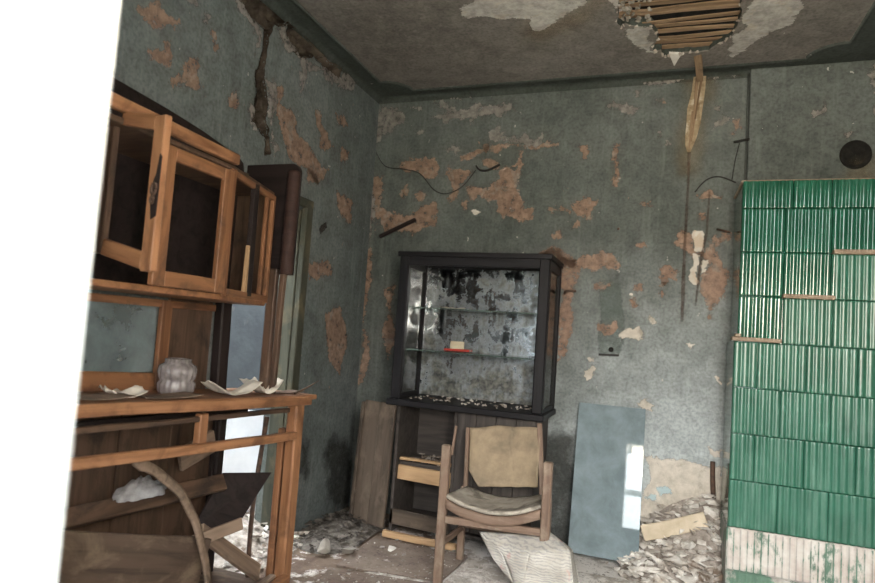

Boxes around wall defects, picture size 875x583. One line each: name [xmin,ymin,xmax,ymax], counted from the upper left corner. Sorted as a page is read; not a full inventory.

peeling [136,0,181,30]
crack [235,0,356,157]
peeling [276,84,349,183]
peeling [459,0,587,31]
peeling [624,26,655,53]
flaking render [685,54,706,152]
peeling [728,0,804,58]
peeling [358,96,559,385]
peeling [658,189,732,320]
peeling [325,307,347,375]
peeling [597,320,643,341]
flaking render [640,446,722,525]